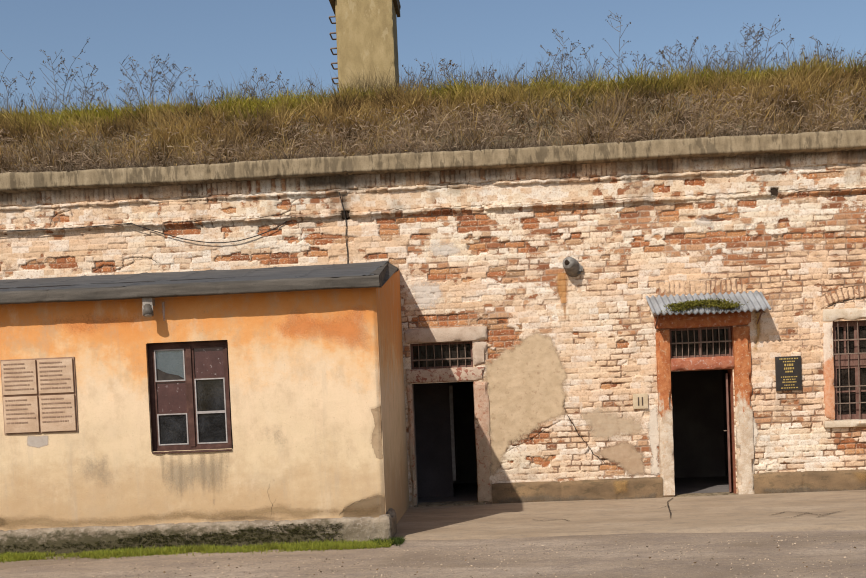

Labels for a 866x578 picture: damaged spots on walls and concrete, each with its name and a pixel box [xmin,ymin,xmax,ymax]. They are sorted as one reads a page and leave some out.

flaking render [371,407,382,459]
flaking render [505,429,549,451]
flaking render [526,455,556,468]
crack [510,401,608,464]